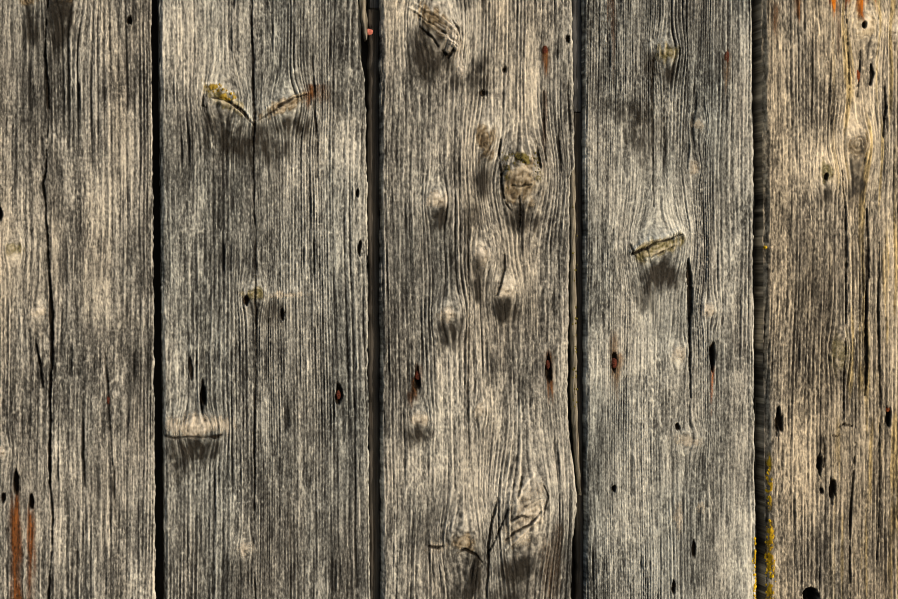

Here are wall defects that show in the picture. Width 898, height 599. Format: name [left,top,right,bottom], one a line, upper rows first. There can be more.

rust [831,0,863,18]
crack [685,259,693,398]
rust [10,493,35,599]